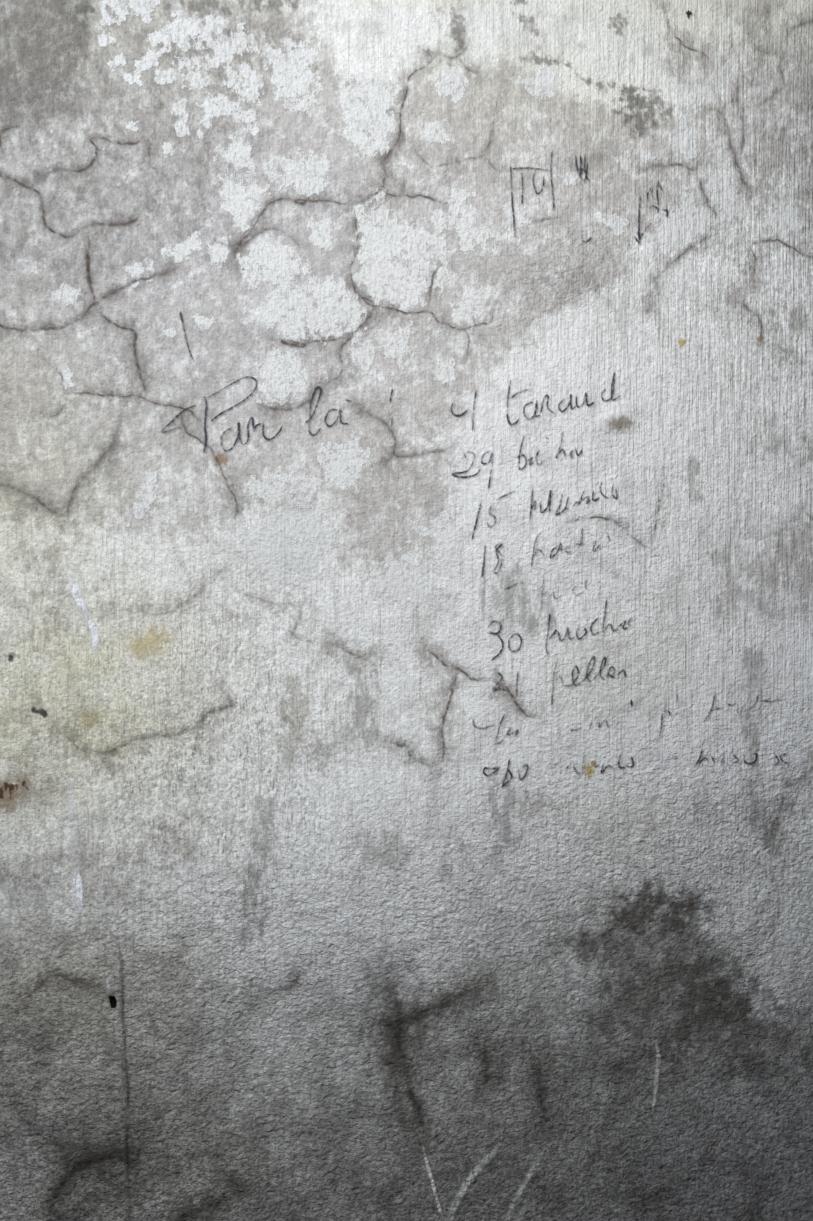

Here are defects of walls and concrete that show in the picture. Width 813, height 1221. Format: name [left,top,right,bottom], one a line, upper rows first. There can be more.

crack [73,137,140,172]
peeling [98,0,500,410]
crack [235,62,493,379]
peeling [51,283,81,306]
crack [0,175,238,507]
peeling [133,471,157,519]
peeling [235,433,373,592]
peeling [369,508,470,611]
crack [575,490,663,541]
crack [432,653,477,756]
rust [0,781,28,798]
leakage [612,886,707,934]